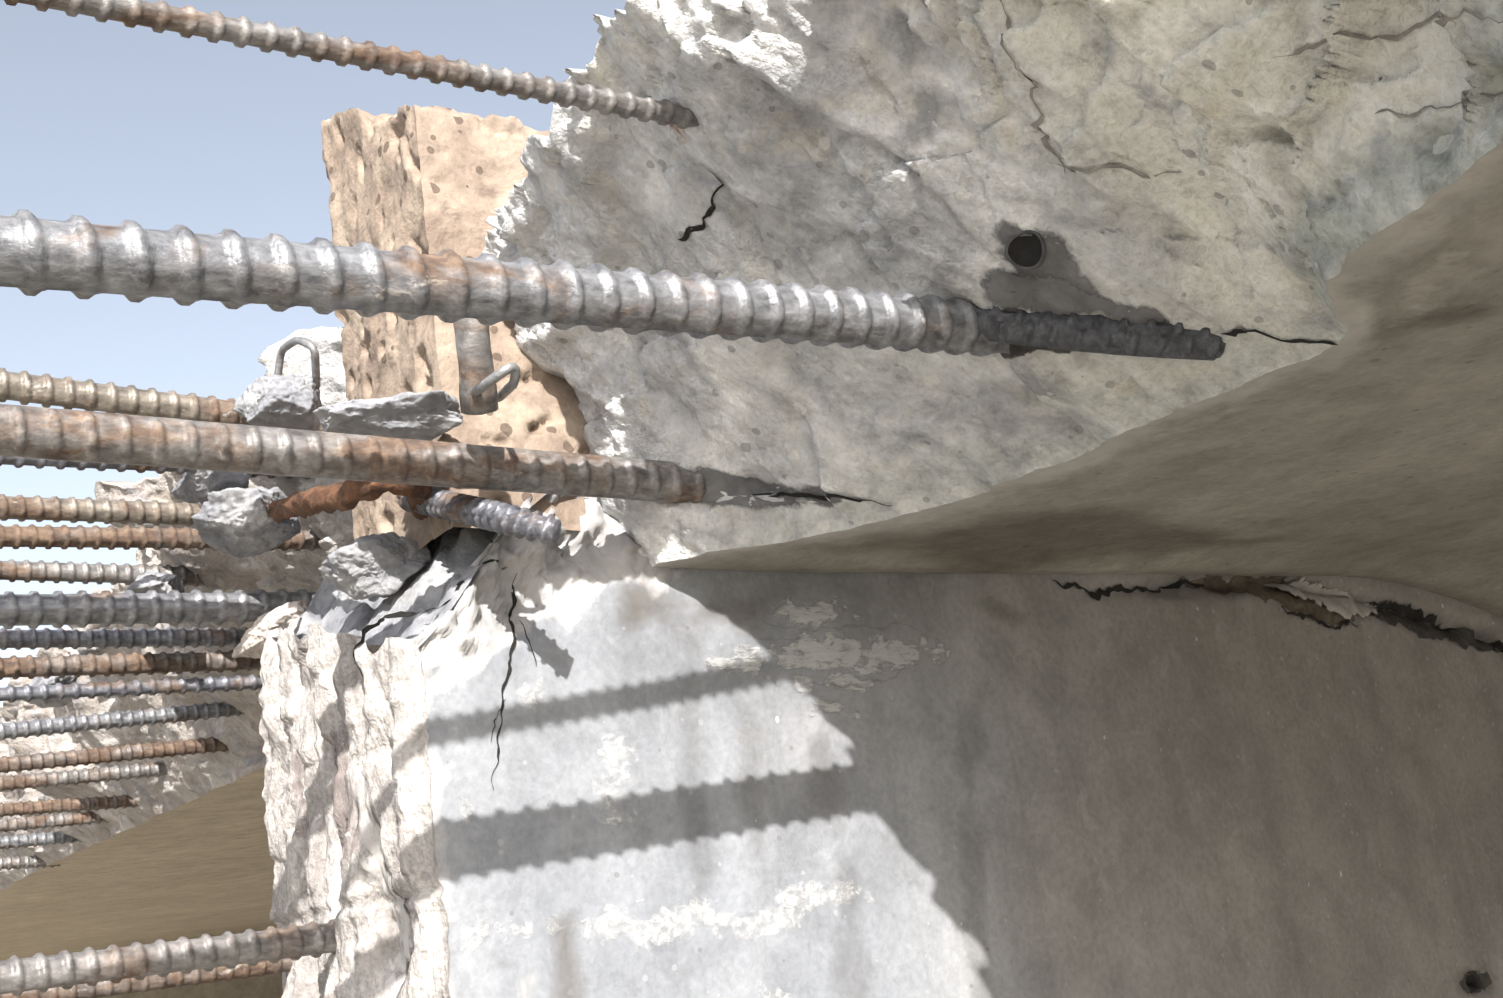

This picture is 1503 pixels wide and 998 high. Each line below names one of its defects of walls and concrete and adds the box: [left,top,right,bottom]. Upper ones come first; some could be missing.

crack [1273,8,1503,58]
crack [999,0,1181,179]
crack [1375,92,1503,117]
crack [678,170,724,242]
spalling [0,0,1503,567]
crack [1221,329,1338,345]
crack [751,492,893,506]
spalling [0,368,706,891]
crack [353,559,537,789]
spalling [325,732,414,998]
leakage [588,881,860,946]
spalling [0,919,337,998]